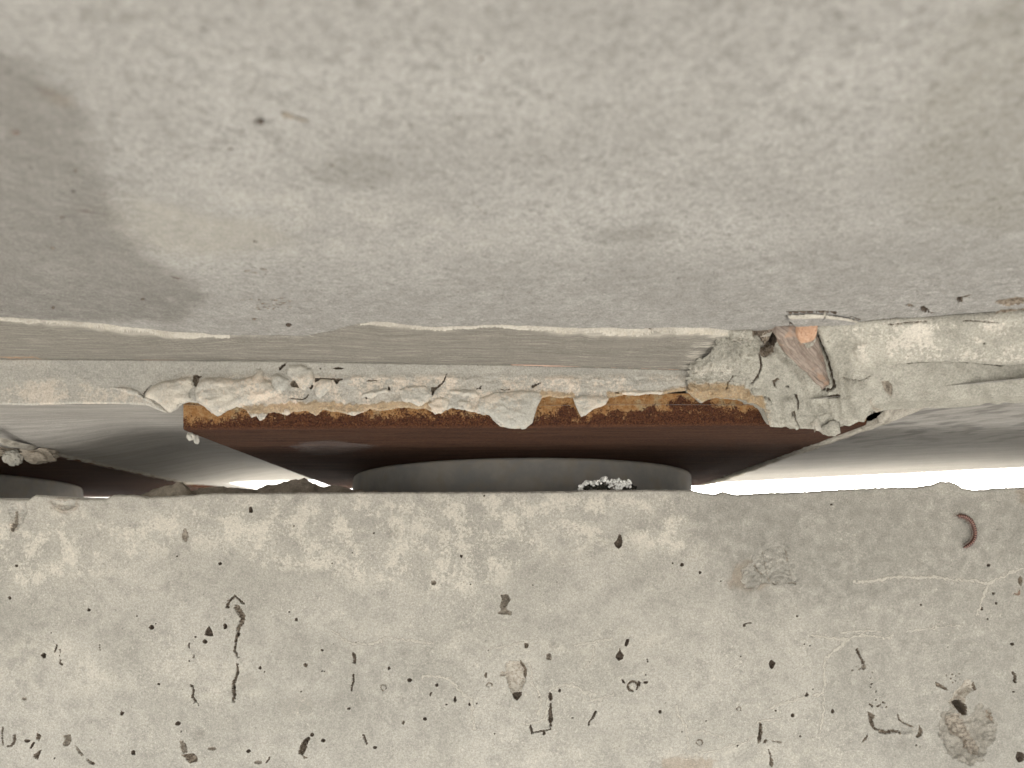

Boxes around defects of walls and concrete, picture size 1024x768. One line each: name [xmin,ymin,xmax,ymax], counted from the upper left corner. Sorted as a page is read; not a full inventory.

spalling [752,330,777,357]